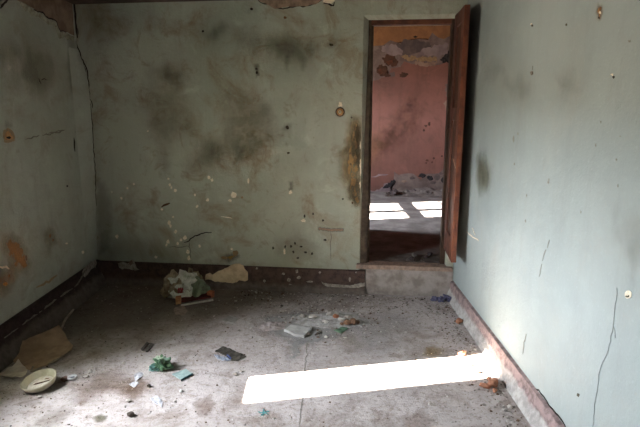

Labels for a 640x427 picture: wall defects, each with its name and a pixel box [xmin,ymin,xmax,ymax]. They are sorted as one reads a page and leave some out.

peeling [18,0,74,43]
peeling [258,0,335,9]
peeling [373,33,450,81]
crack [73,4,97,206]
peeling [370,170,443,192]
crack [172,232,212,259]
crack [592,288,617,427]